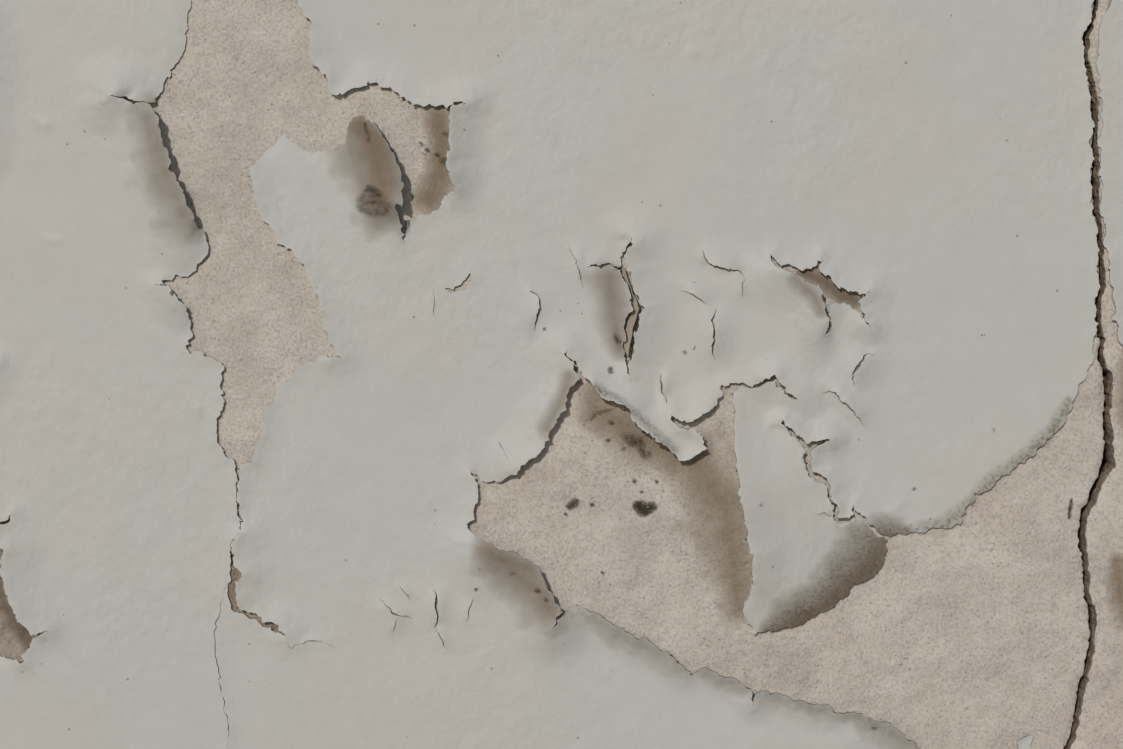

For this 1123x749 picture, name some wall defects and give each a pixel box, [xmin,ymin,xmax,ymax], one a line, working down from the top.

peeling [0,456,77,683]
crack [210,591,243,749]
peeling [65,0,500,664]
peeling [426,202,1123,749]
crack [1063,0,1123,749]